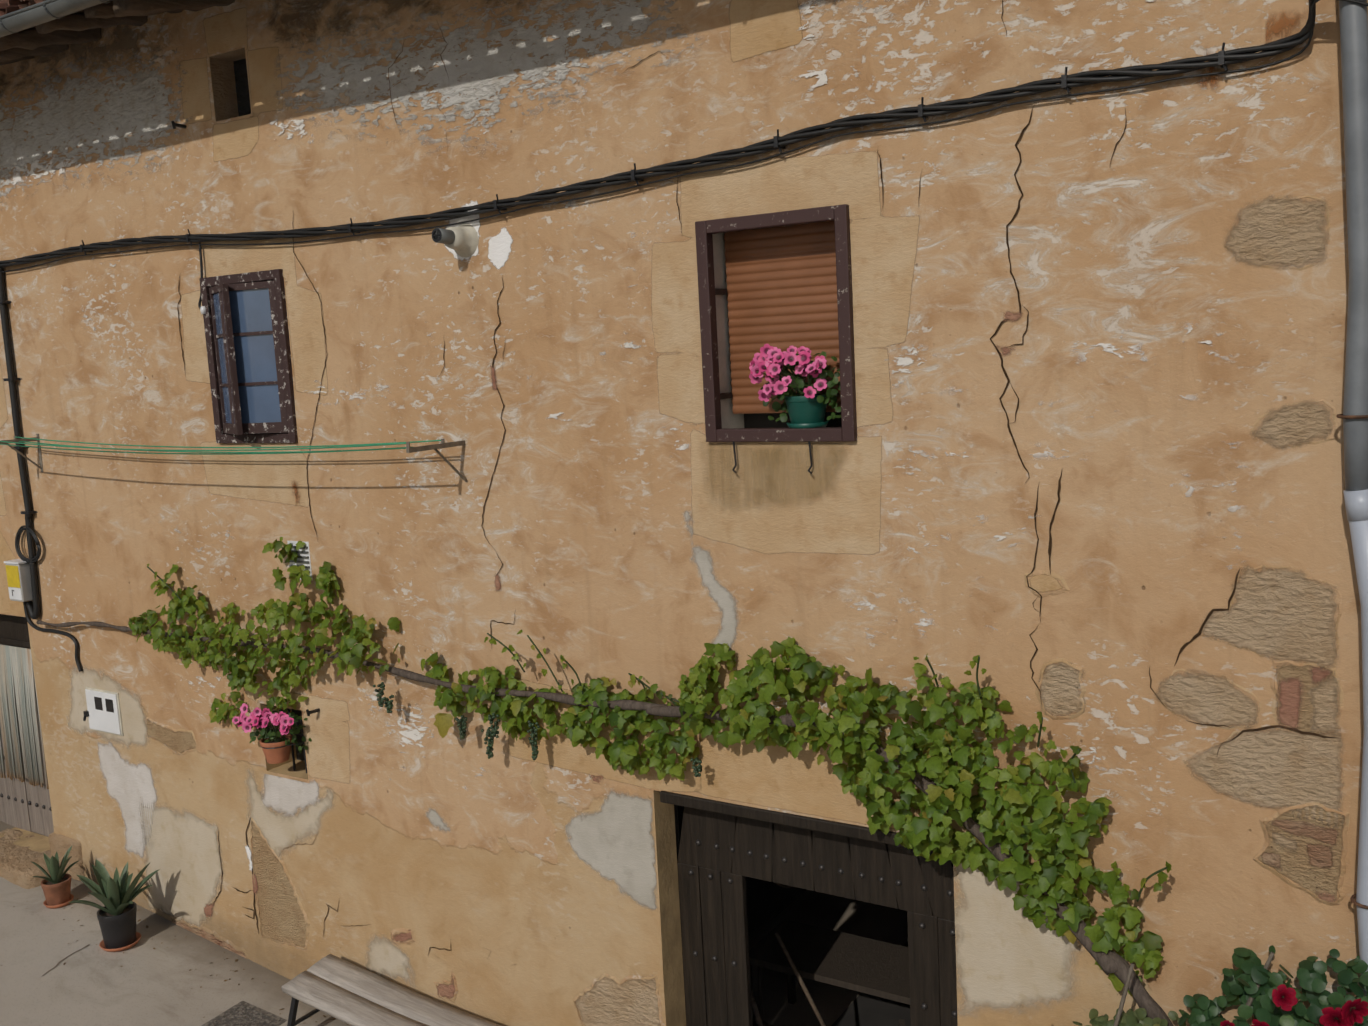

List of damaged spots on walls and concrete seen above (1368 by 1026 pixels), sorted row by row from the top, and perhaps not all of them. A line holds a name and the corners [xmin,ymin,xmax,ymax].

peeling [0,52,186,197]
crack [481,278,516,648]
crack [990,104,1062,704]
spalling [250,817,310,951]
spalling [573,973,665,1026]
spalling [1157,532,1350,906]